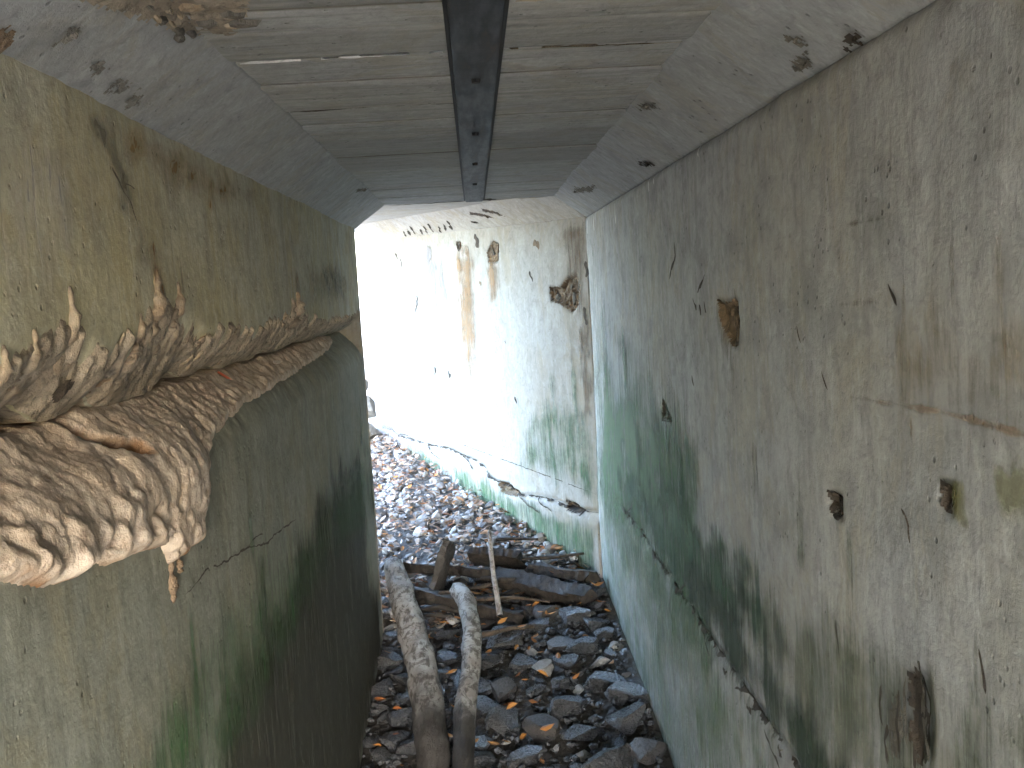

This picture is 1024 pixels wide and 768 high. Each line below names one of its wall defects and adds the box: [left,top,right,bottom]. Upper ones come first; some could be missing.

spalling [73,0,261,43]
spalling [470,199,505,263]
damp [118,270,186,364]
corrosion [456,247,475,375]
spalling [549,252,593,325]
damp [0,286,336,604]
crack [186,519,296,594]
damp [222,408,381,768]
crack [382,427,800,768]
spalling [827,490,844,521]
damp [685,560,844,768]
spalling [879,661,931,768]